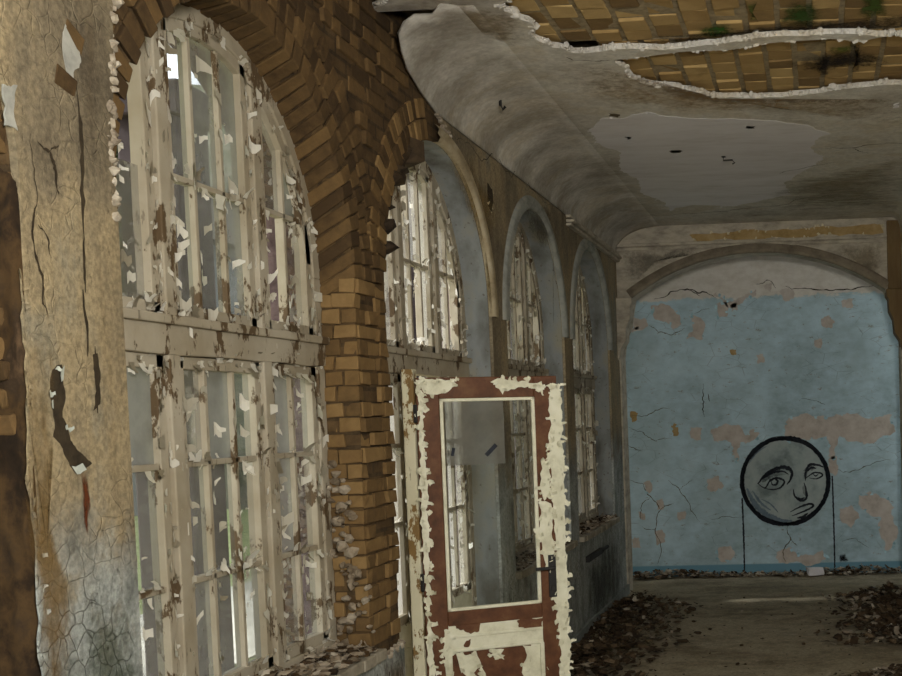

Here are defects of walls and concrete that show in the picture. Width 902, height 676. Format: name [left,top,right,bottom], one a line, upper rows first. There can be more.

spalling [54,64,78,96]
spalling [66,19,84,55]
spalling [493,0,902,99]
peeling [587,112,830,211]
spalling [0,168,51,676]
spalling [50,364,92,474]
spalling [93,353,101,411]
spalling [106,0,468,676]
peeling [711,283,795,319]
peeling [783,412,896,476]
peeling [446,471,477,604]
crack [631,480,738,562]